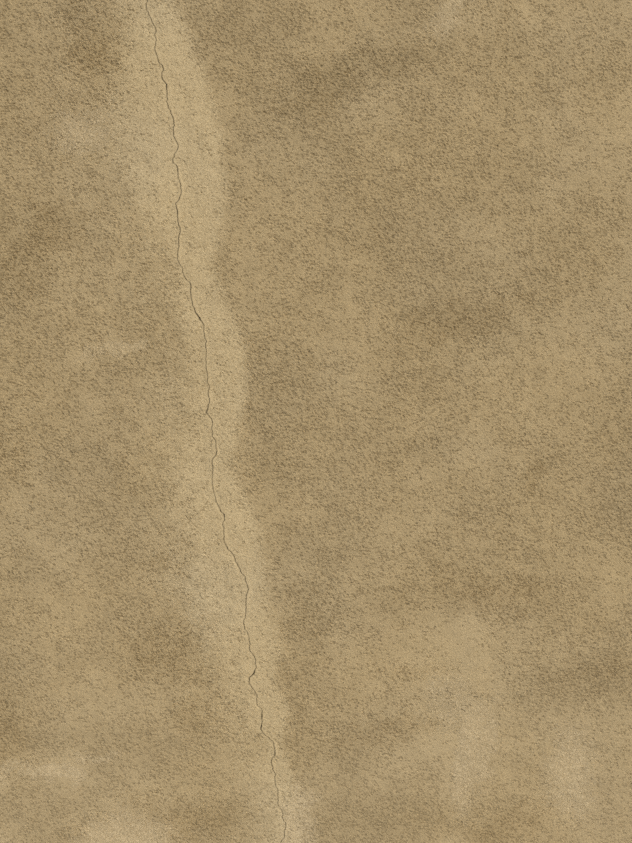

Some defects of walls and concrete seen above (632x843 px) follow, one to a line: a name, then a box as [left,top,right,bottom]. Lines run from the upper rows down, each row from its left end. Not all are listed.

crack [146,0,286,841]